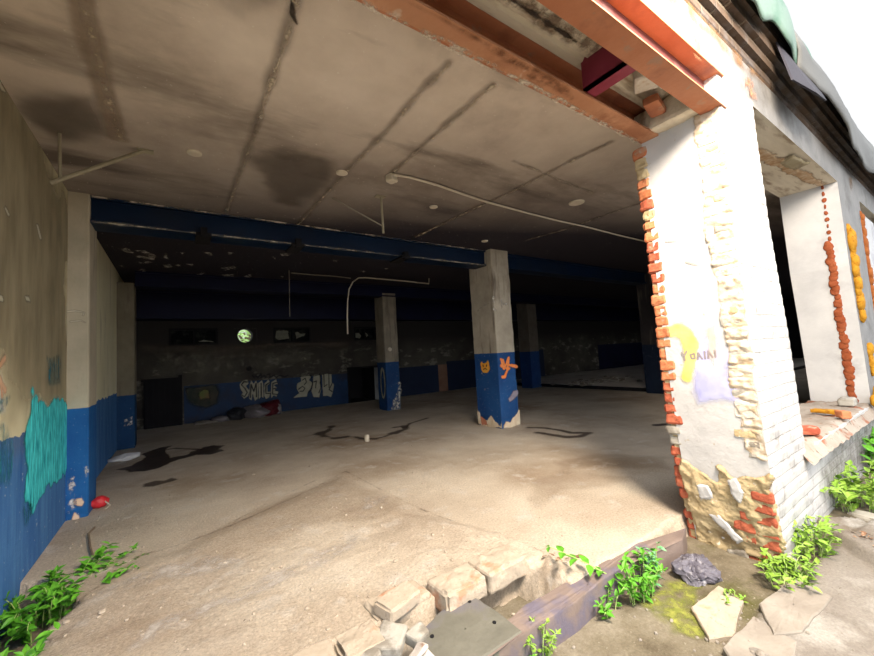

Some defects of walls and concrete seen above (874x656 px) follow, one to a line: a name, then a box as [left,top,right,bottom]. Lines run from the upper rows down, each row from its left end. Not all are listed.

flaking render [477,409,520,428]
flaking render [508,75,787,563]
flaking render [758,148,859,403]